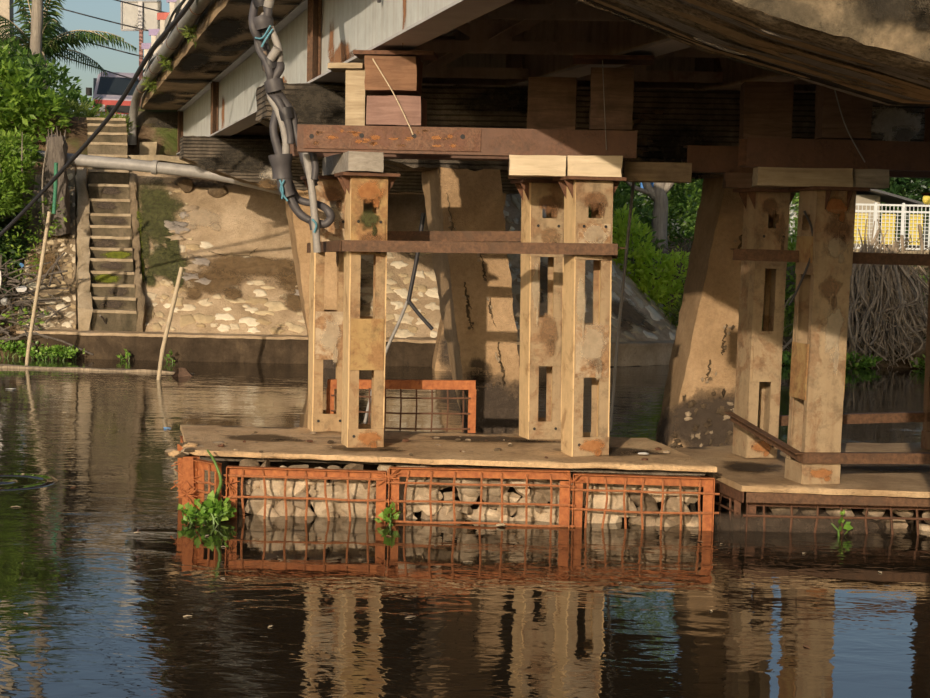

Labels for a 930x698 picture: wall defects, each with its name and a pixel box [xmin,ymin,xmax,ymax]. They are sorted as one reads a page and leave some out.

crack [462,253,505,385]
crack [701,324,735,383]
leakage [431,359,556,442]
leakage [603,389,735,456]